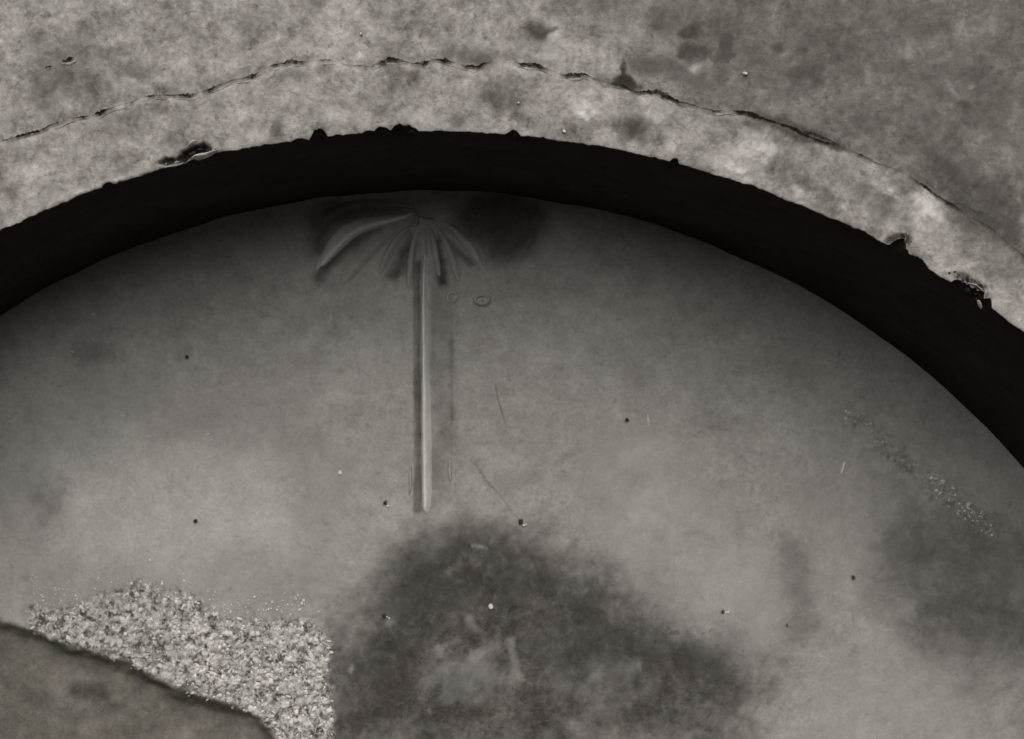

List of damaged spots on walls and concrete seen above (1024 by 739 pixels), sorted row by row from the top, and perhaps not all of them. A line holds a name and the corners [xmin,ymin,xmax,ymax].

flaking render [156,140,218,165]
crack [2,56,491,141]
crack [518,62,960,210]
flaking render [948,271,984,309]